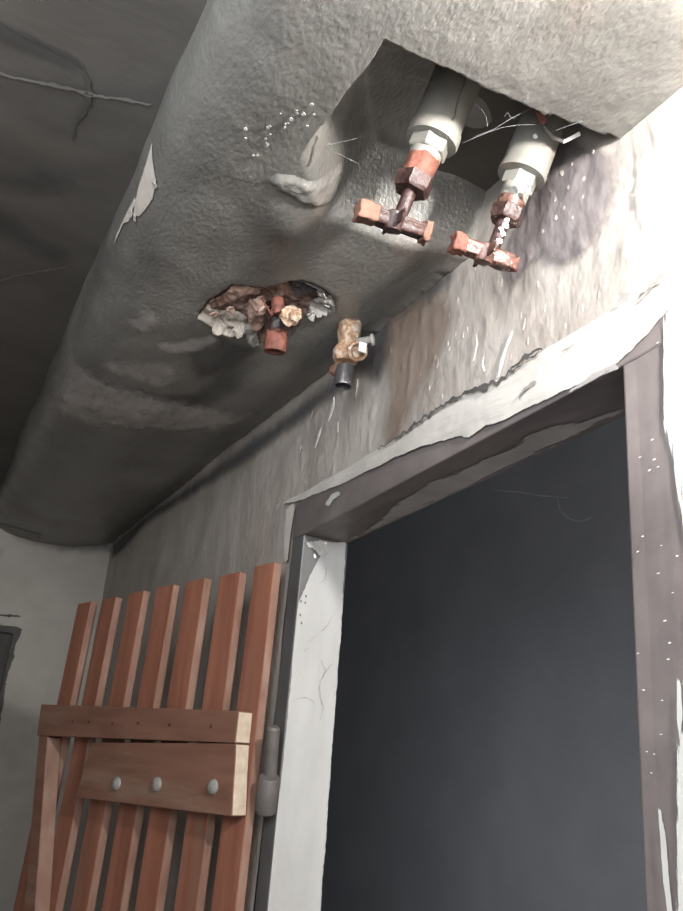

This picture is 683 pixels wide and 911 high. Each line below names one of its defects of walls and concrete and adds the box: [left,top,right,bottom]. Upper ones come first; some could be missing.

crack [0,72,153,124]
peeling [114,144,157,243]
spalling [197,280,336,347]
crack [378,348,542,450]